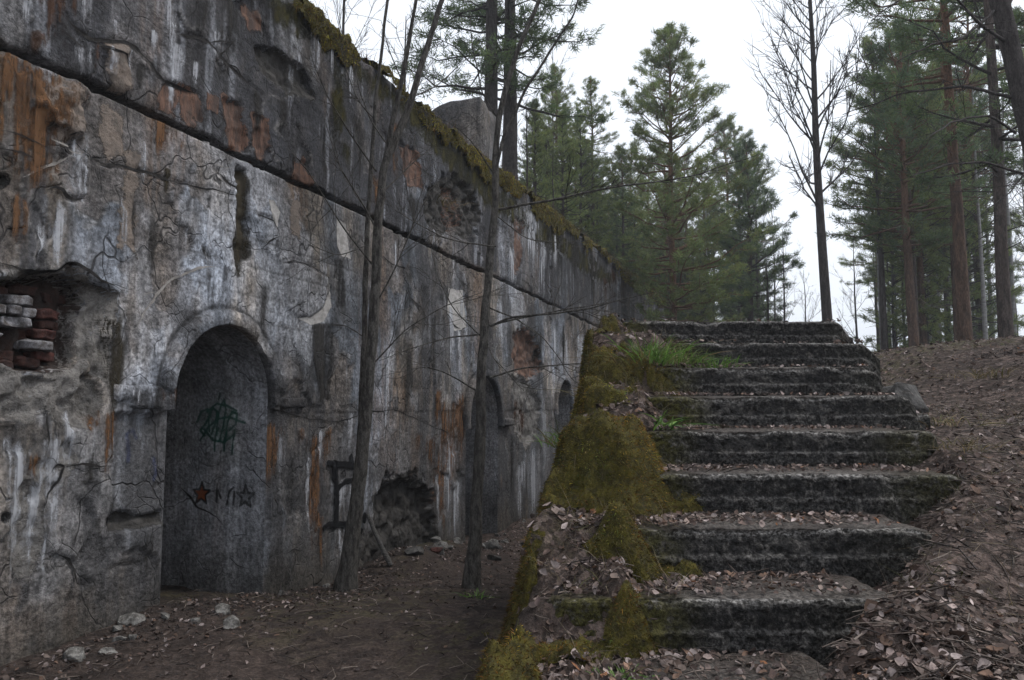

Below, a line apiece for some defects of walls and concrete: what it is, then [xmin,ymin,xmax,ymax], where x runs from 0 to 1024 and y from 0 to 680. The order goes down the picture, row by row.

corrosion [0,0,80,187]
crack [93,159,237,196]
spalling [398,144,481,241]
spalling [0,261,120,430]
spalling [511,327,542,452]
efflorescence [4,413,74,541]
crack [57,554,84,585]
crack [43,406,119,532]
corrosion [300,428,332,563]
spalling [360,472,436,565]
corrosion [417,390,464,522]